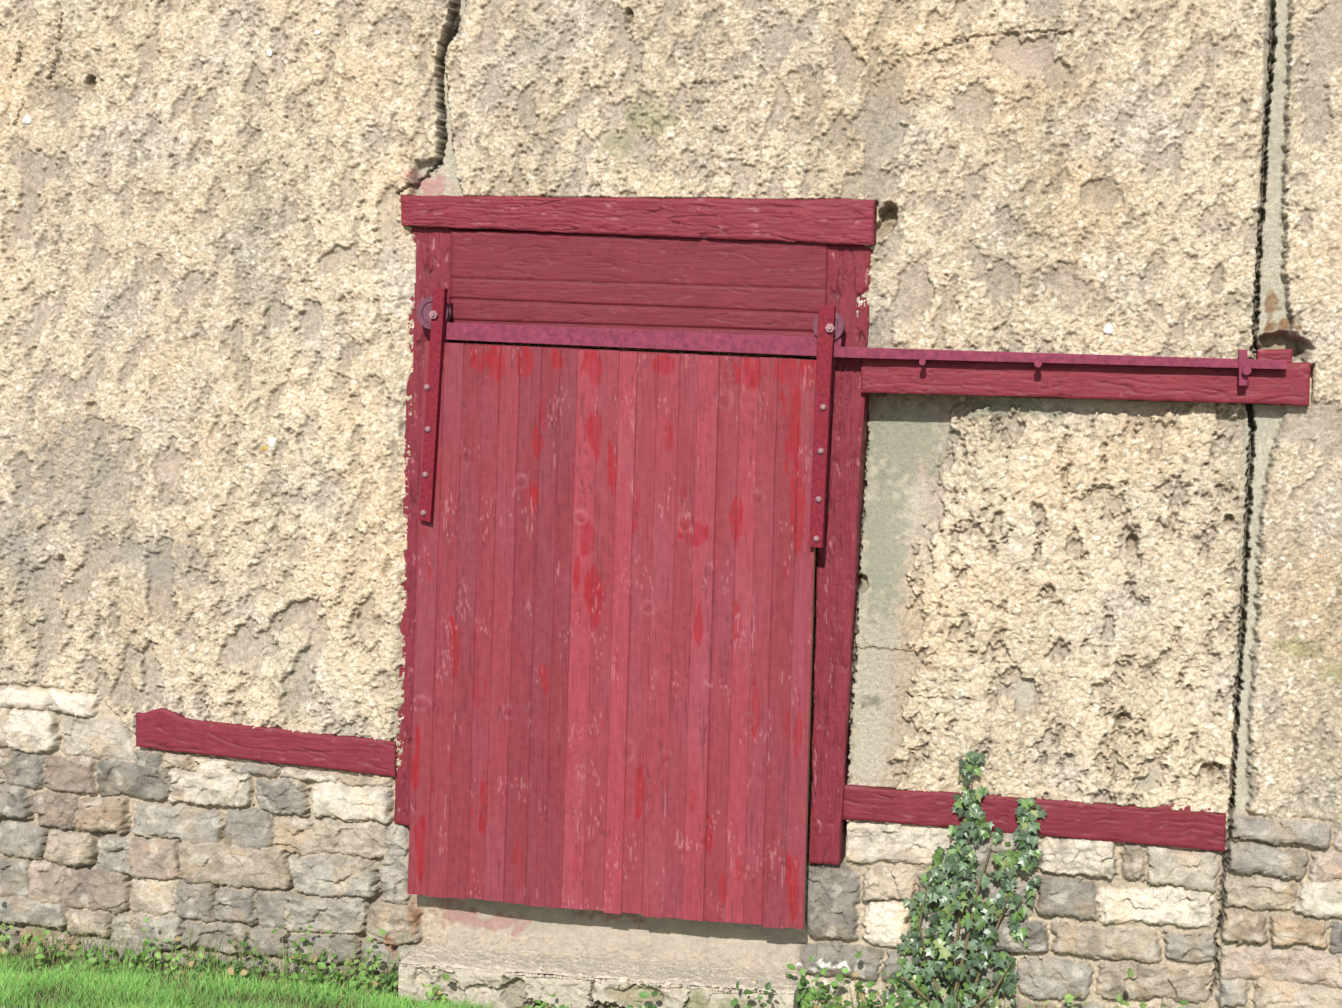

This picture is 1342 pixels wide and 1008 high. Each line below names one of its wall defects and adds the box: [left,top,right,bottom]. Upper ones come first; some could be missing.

crack [395,0,461,196]